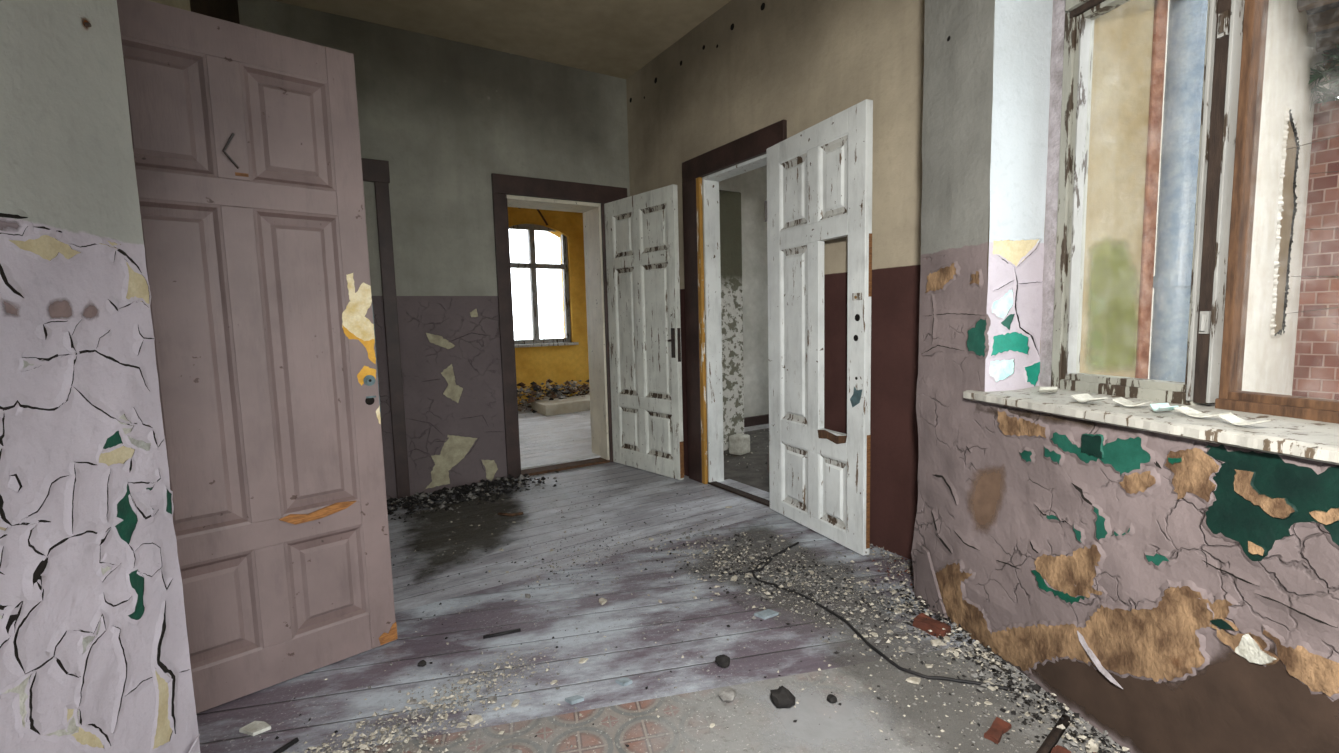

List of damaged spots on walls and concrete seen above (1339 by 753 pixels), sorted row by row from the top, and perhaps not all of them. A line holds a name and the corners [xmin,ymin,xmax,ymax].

peeling [990,238,1043,268]
peeling [342,273,376,386]
peeling [425,332,464,404]
peeling [965,287,1271,425]
crack [0,203,190,750]
peeling [96,409,174,548]
crack [930,444,1095,573]
peeling [997,408,1339,568]
peeling [123,565,146,626]
spalling [916,503,1339,702]
crack [1202,557,1338,632]
peeling [0,673,105,753]